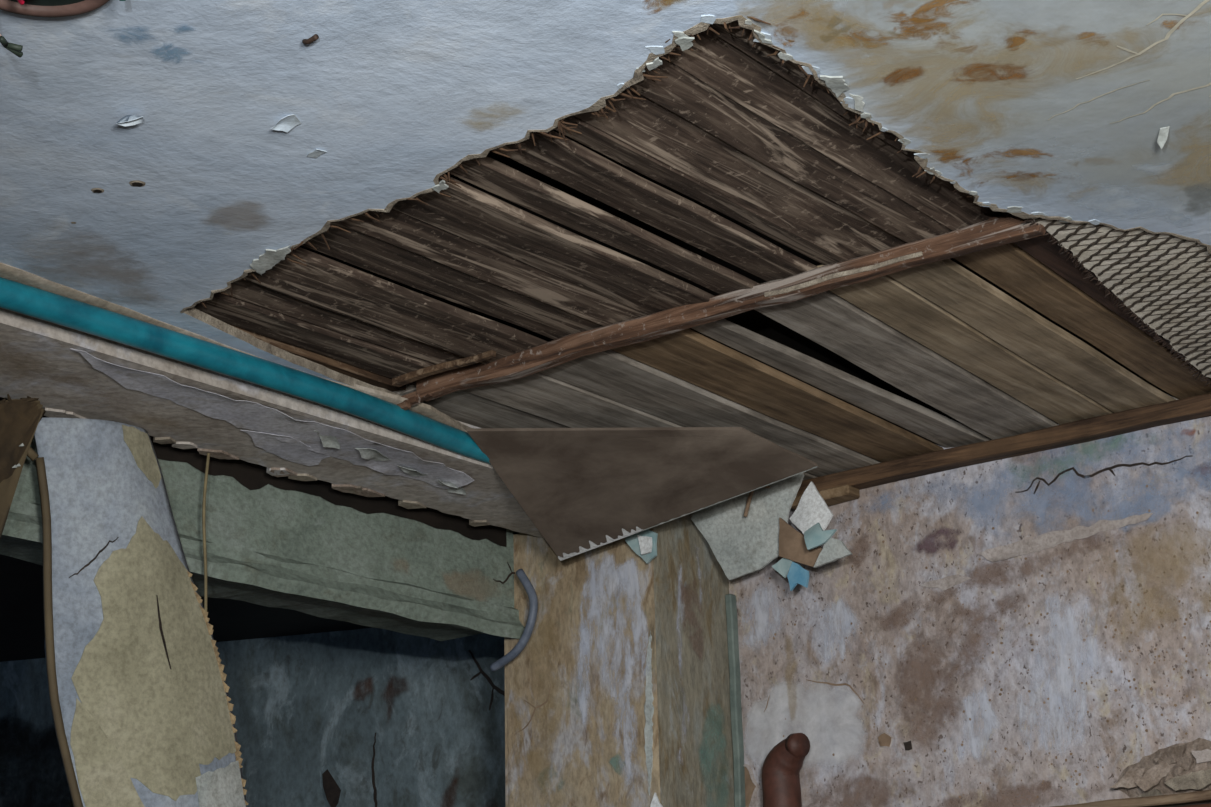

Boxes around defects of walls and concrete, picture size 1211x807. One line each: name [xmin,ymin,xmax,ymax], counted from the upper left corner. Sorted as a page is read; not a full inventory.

flaking render [636,31,694,72]
flaking render [745,19,956,184]
damp [854,0,1211,197]
peeling [271,114,301,132]
peeling [1157,126,1170,149]
flaking render [432,180,449,193]
flaking render [250,245,291,276]
peeling [70,348,474,495]
crack [1015,455,1193,494]
peeling [332,484,426,509]
peeling [70,516,236,807]
damp [578,556,648,777]